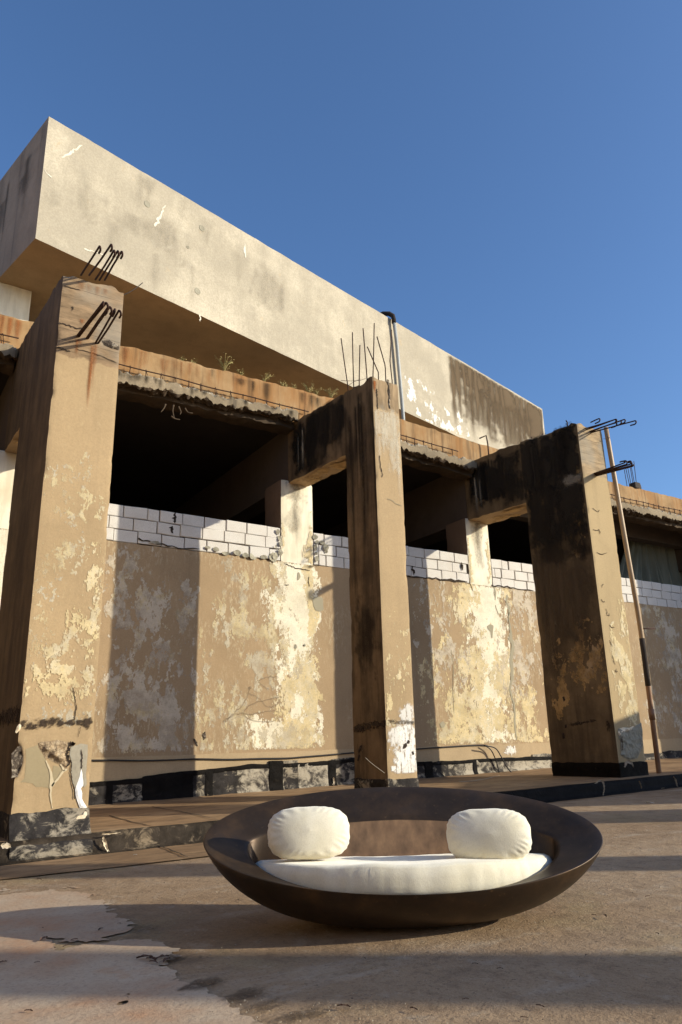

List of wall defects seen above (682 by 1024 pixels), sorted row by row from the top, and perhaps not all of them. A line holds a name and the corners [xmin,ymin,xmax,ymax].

spalling [119,364,309,414]
spalling [341,323,470,437]
damp [291,397,399,521]
damp [449,357,592,655]
peeling [25,452,328,769]
peeling [383,538,682,760]
spalling [11,746,23,778]
peeling [75,770,87,808]